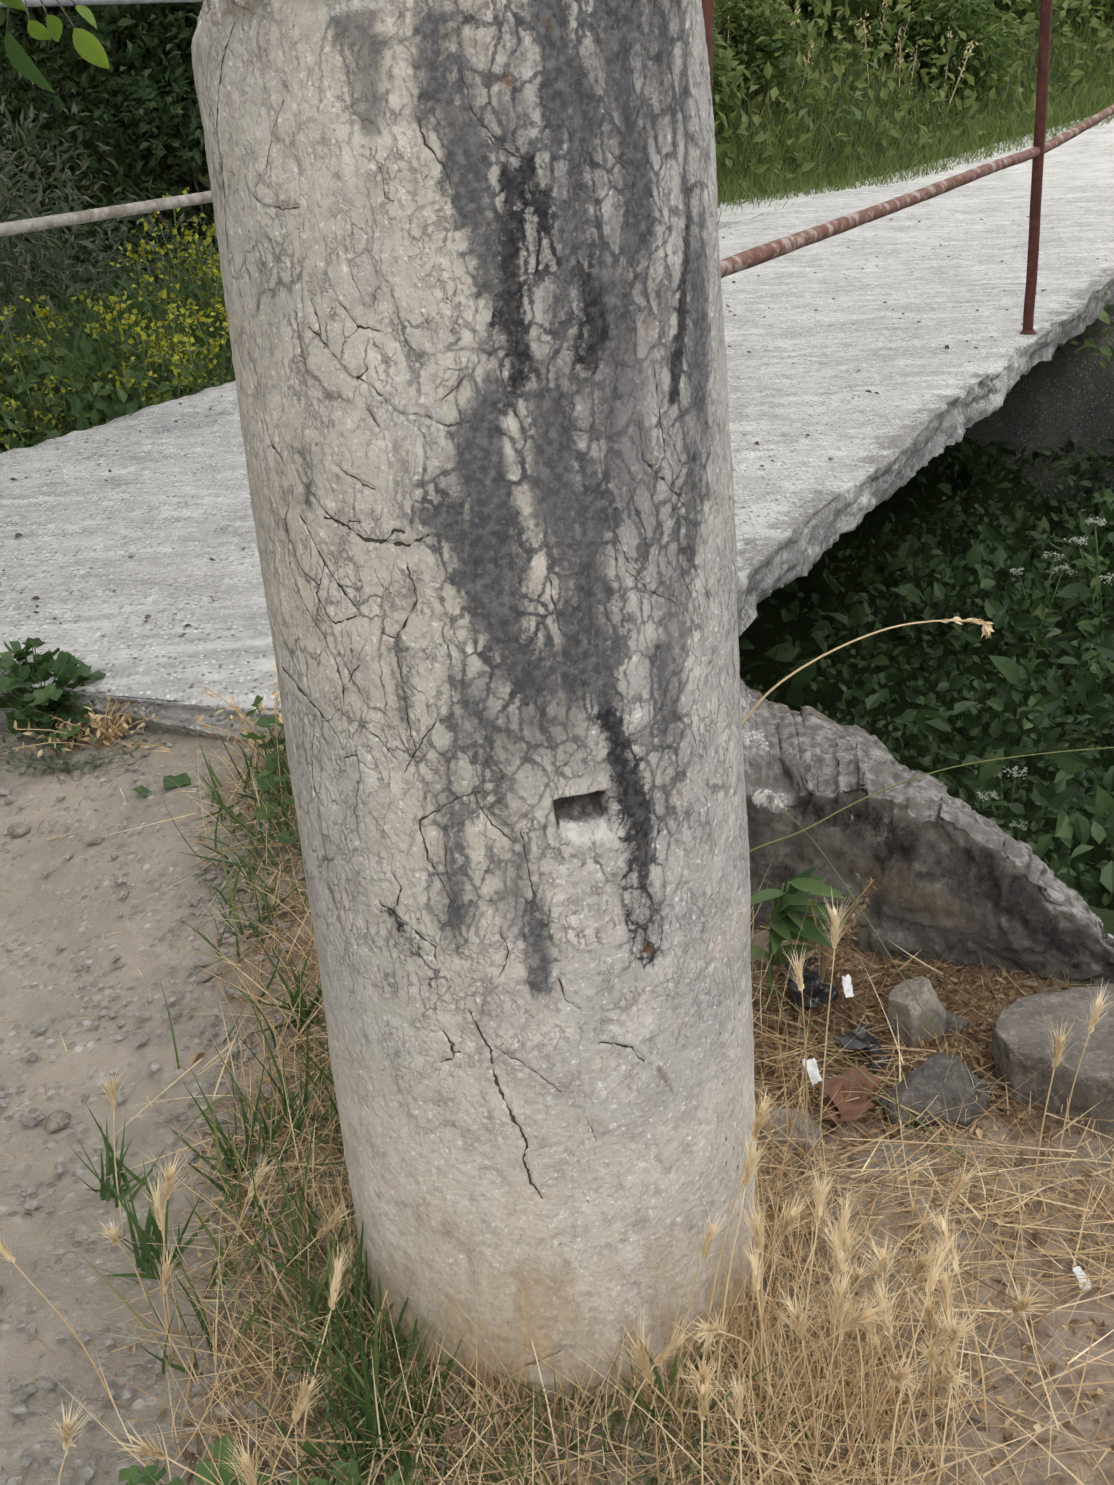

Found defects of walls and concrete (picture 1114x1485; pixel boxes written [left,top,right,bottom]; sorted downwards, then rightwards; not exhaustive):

leakage [324,0,394,16]
crack [216,22,299,248]
crack [414,110,452,188]
crack [309,299,467,449]
leakage [299,452,311,507]
leakage [381,0,765,997]
crack [616,366,710,617]
crack [254,385,436,834]
leakage [741,698,770,750]
crack [379,791,541,965]
crack [440,1012,561,1199]
crack [598,1042,645,1061]